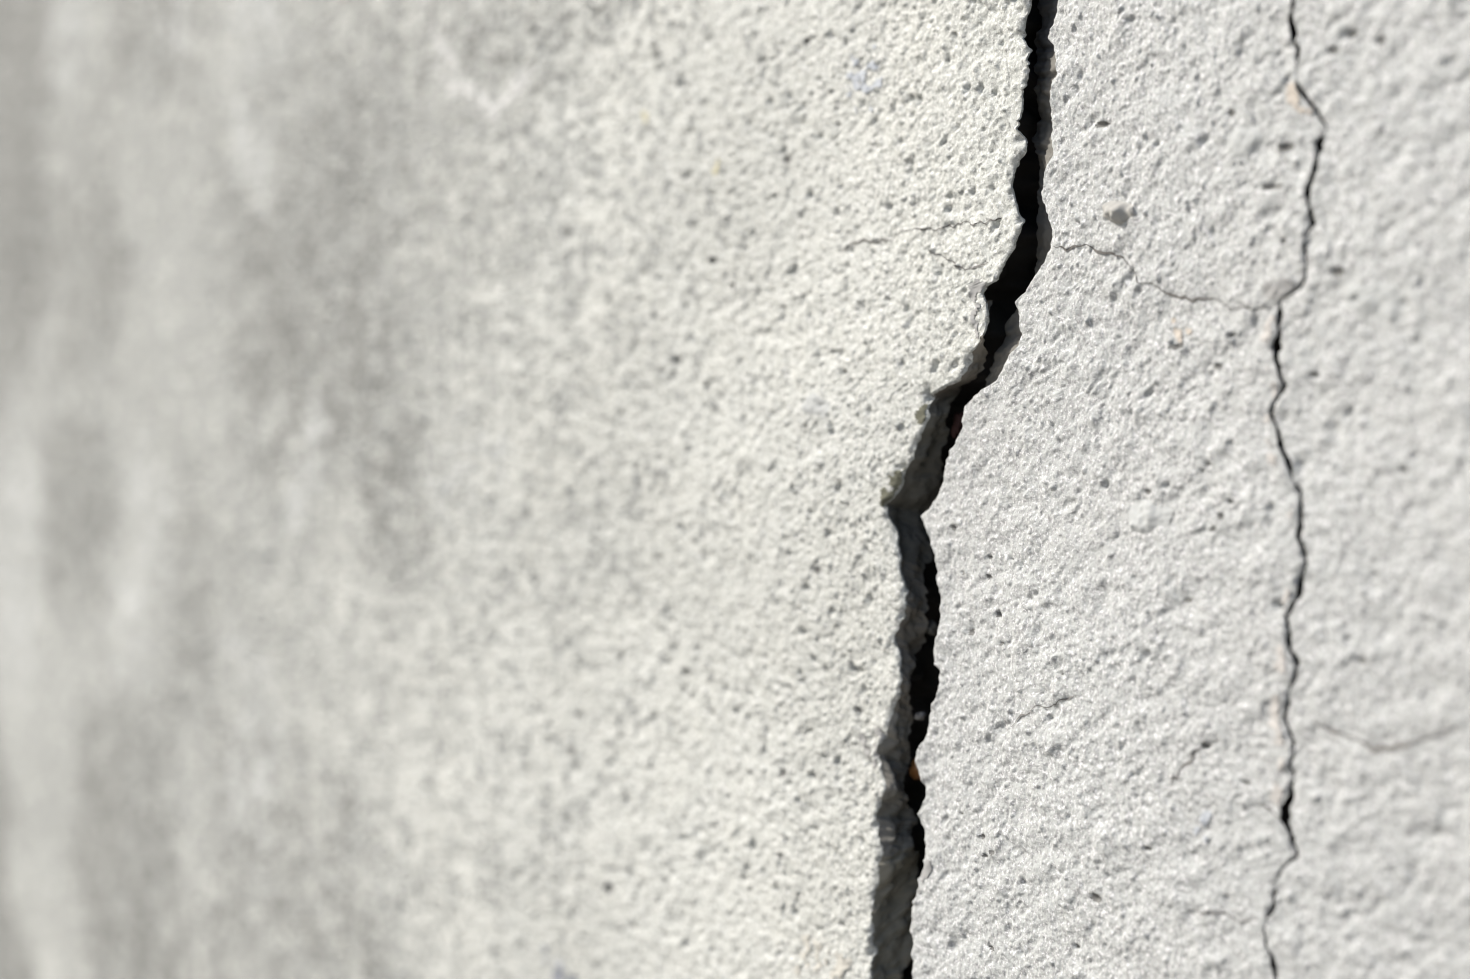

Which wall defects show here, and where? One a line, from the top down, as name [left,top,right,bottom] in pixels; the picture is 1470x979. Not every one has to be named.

crack [837,0,1456,979]